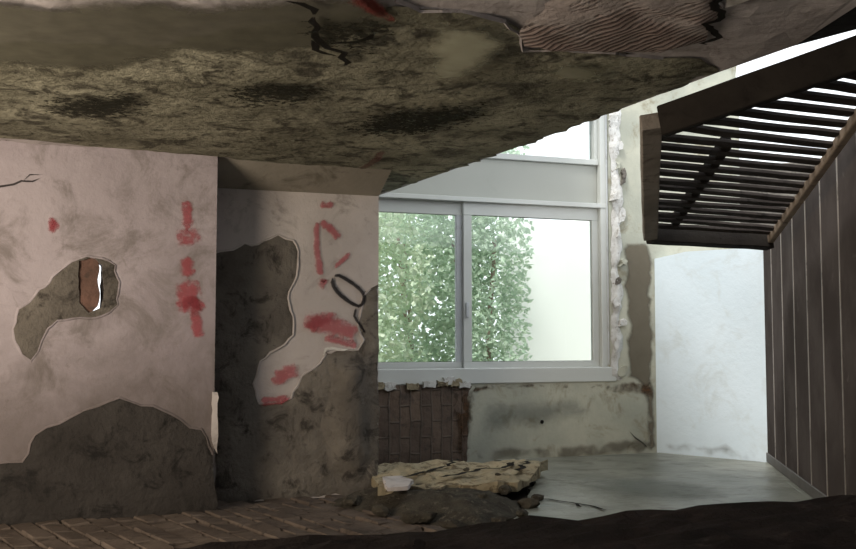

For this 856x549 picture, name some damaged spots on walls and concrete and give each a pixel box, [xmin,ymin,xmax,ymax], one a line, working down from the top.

water stain [43,89,161,121]
water stain [208,80,329,111]
water stain [334,102,494,138]
crack [0,174,39,187]
peeling [0,0,749,380]
flaking render [0,234,475,527]